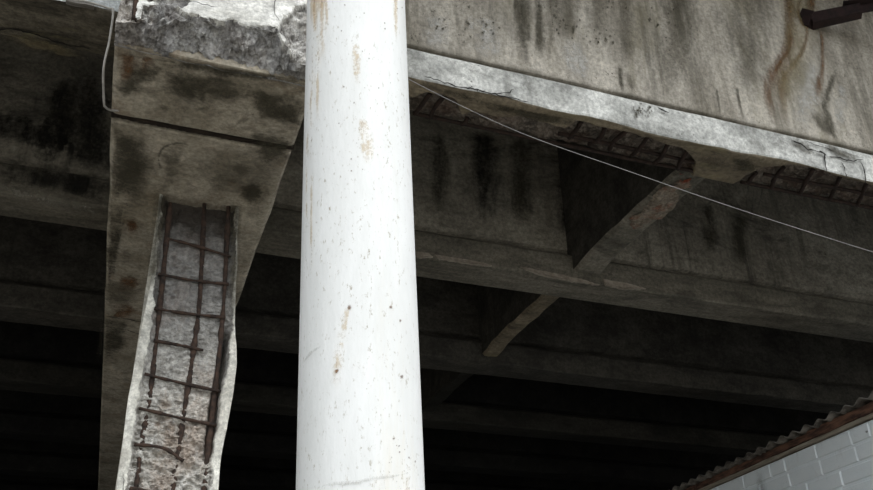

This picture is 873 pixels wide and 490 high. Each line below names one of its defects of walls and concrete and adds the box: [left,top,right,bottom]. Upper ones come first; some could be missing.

water stain [0,77,146,197]
spalling [114,0,307,87]
water stain [167,64,275,100]
water stain [254,91,299,125]
water stain [493,104,562,123]
water stain [515,0,585,69]
spalling [409,92,695,229]
rust [765,0,815,97]
spalling [740,164,873,210]
water stain [798,63,855,157]
crack [792,140,866,183]
spalling [125,196,236,490]